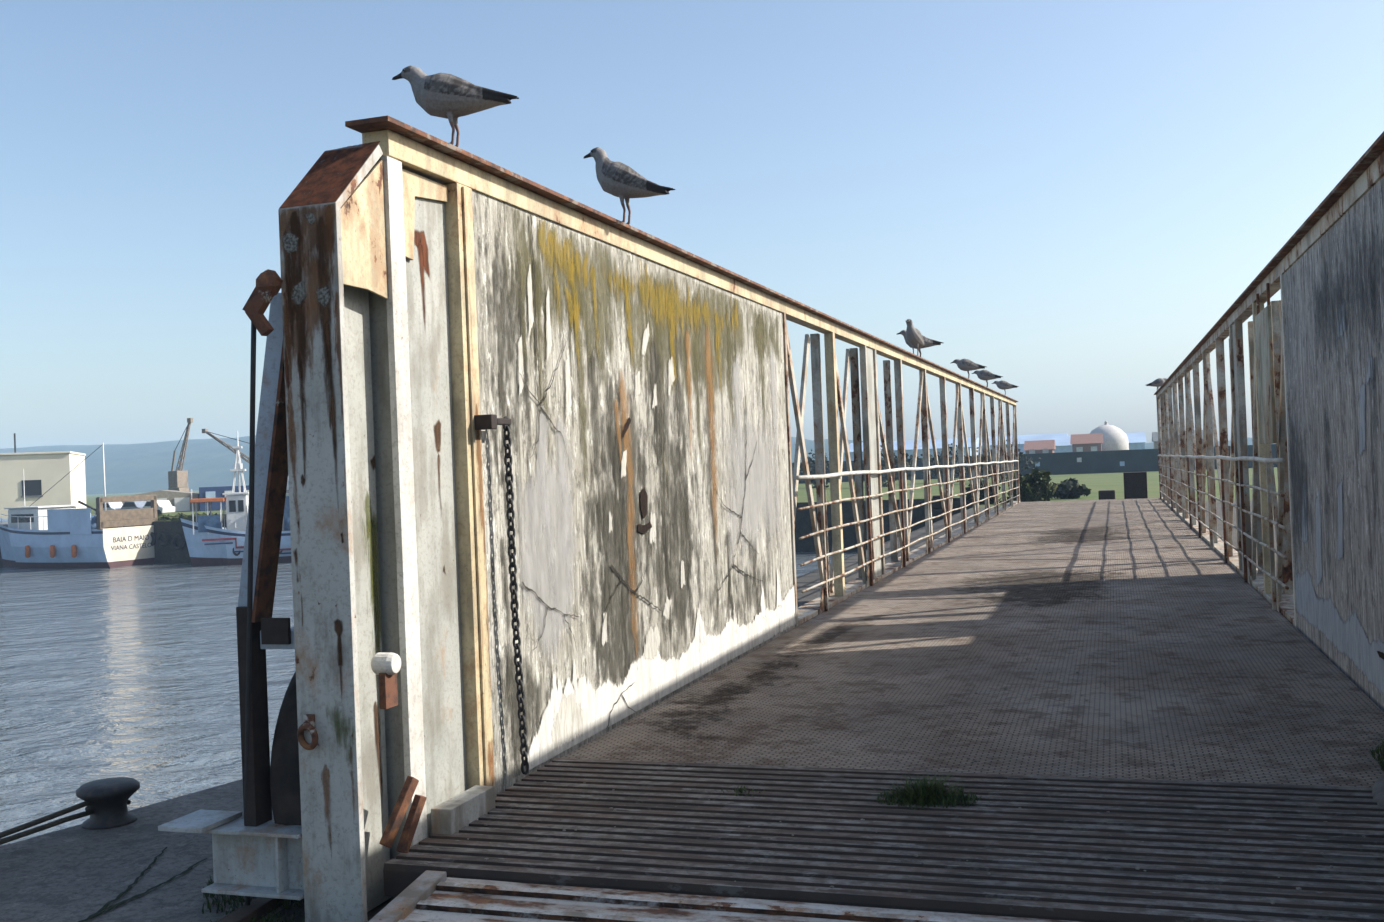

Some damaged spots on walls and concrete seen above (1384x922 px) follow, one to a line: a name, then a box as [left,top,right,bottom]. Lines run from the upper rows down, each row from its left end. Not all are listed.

rust [278,141,380,528]
water stain [1313,184,1384,513]
water stain [478,208,781,778]
water stain [1288,412,1330,576]
crack [522,562,661,654]
rust [374,702,383,792]
crack [607,684,636,727]
water stain [651,623,851,739]
crack [78,847,207,922]